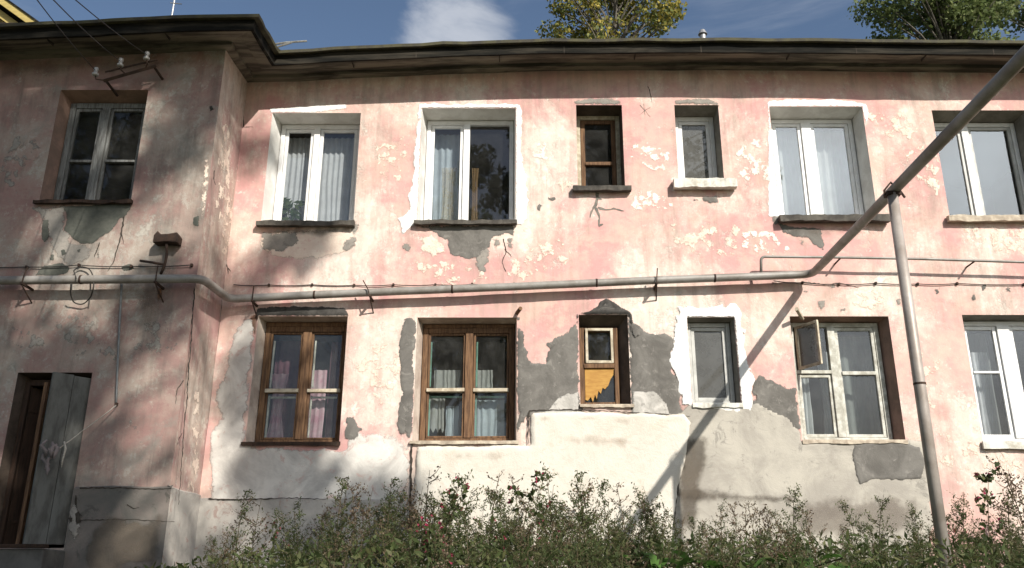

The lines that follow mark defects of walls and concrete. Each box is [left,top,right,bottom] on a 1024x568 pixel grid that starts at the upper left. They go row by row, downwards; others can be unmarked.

peeling [631,142,670,170]
peeling [736,139,770,188]
peeling [868,107,940,199]
crack [590,193,624,227]
peeling [629,191,673,210]
peeling [32,204,131,276]
crack [94,216,125,269]
peeling [260,224,359,260]
peeling [403,225,571,285]
spalling [577,299,640,337]
peeling [345,417,362,440]
peeling [397,402,406,435]